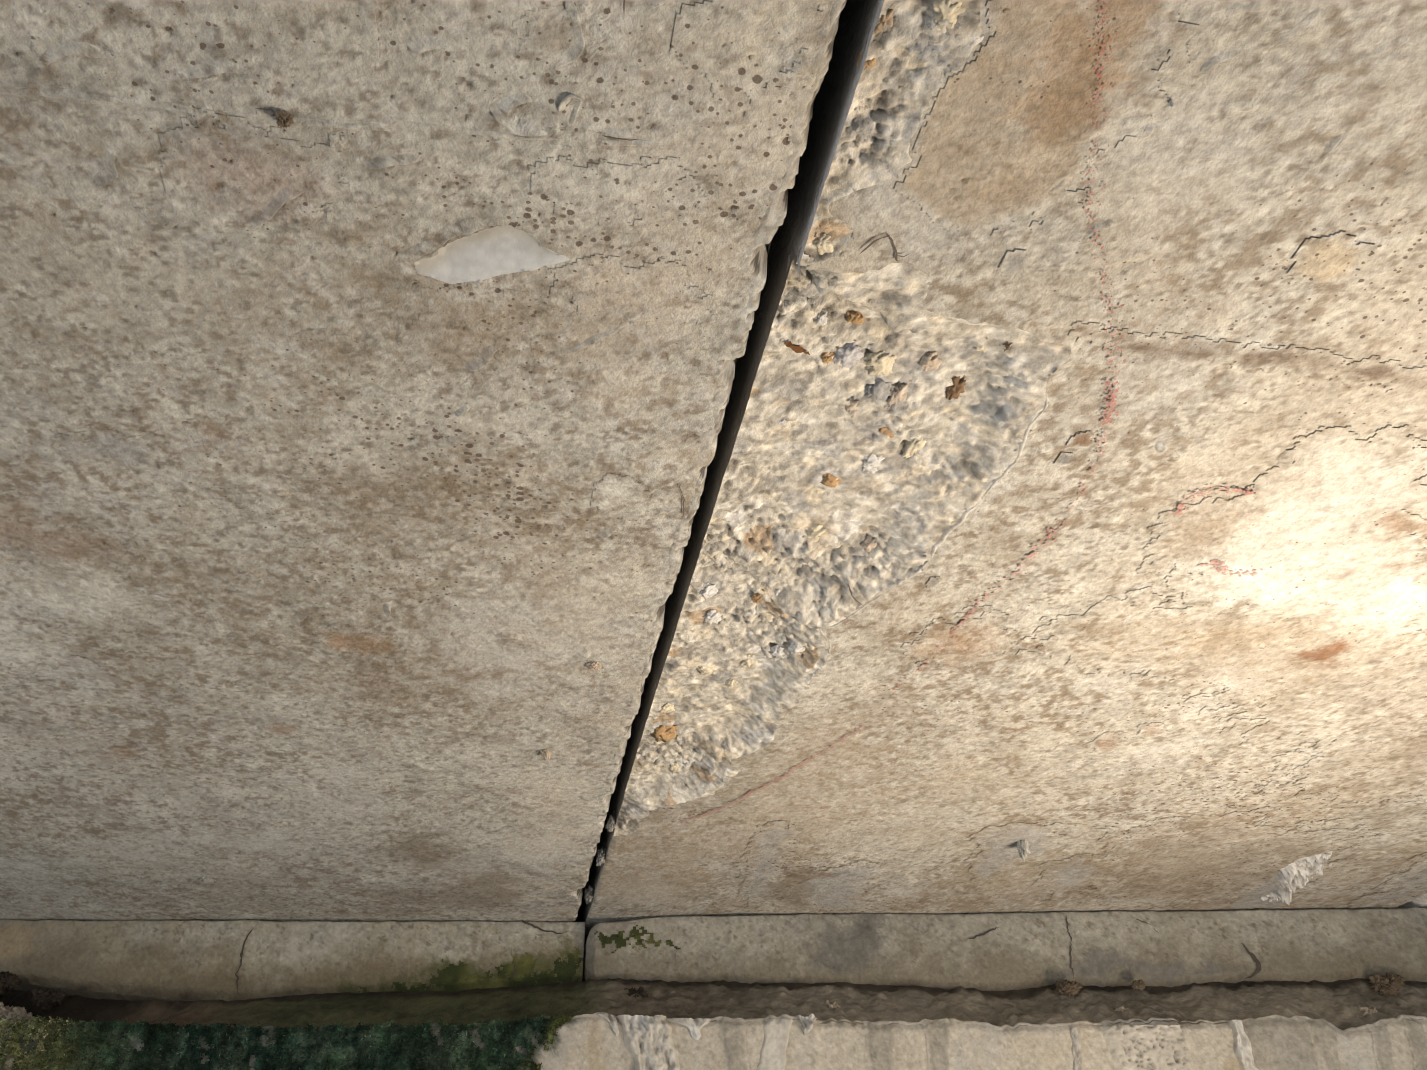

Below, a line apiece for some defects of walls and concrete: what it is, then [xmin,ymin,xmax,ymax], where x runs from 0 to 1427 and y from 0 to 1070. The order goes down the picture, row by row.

peeling [489,93,646,138]
peeling [395,218,570,284]
spalling [566,0,1071,921]
crack [235,922,259,996]
crack [1065,916,1074,979]